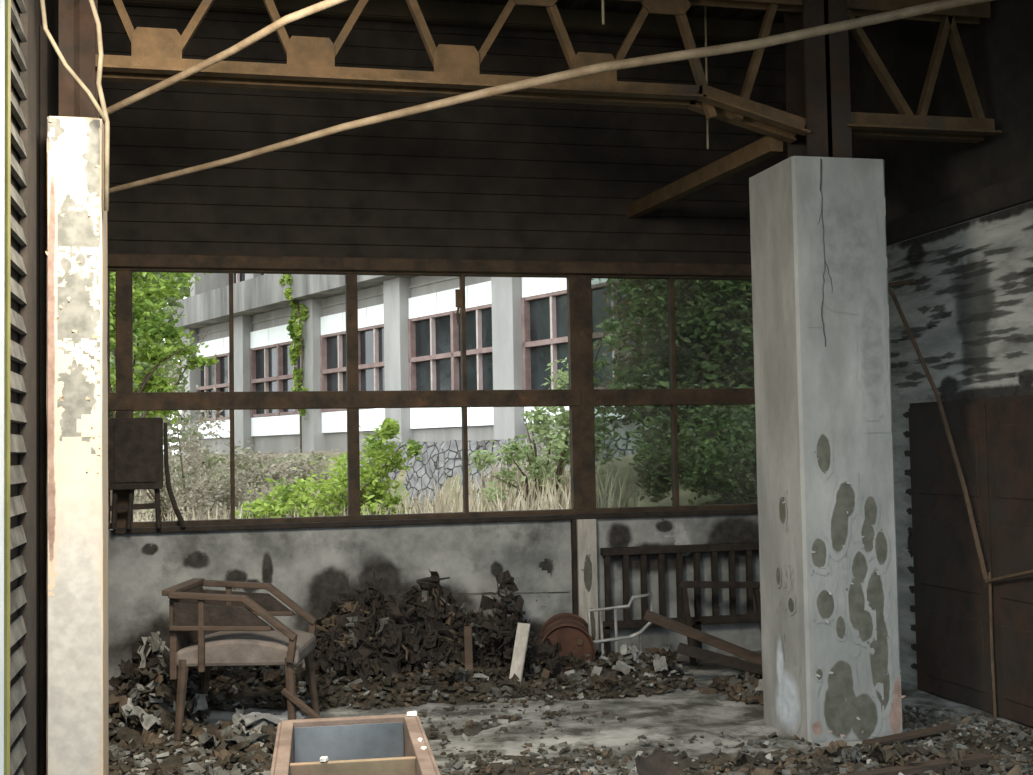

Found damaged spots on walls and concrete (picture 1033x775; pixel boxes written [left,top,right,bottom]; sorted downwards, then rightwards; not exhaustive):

peeling [45,118,101,476]
crack [818,159,832,347]
water stain [804,179,1033,438]
peeling [778,489,788,531]
peeling [809,425,906,743]
water stain [907,547,917,670]